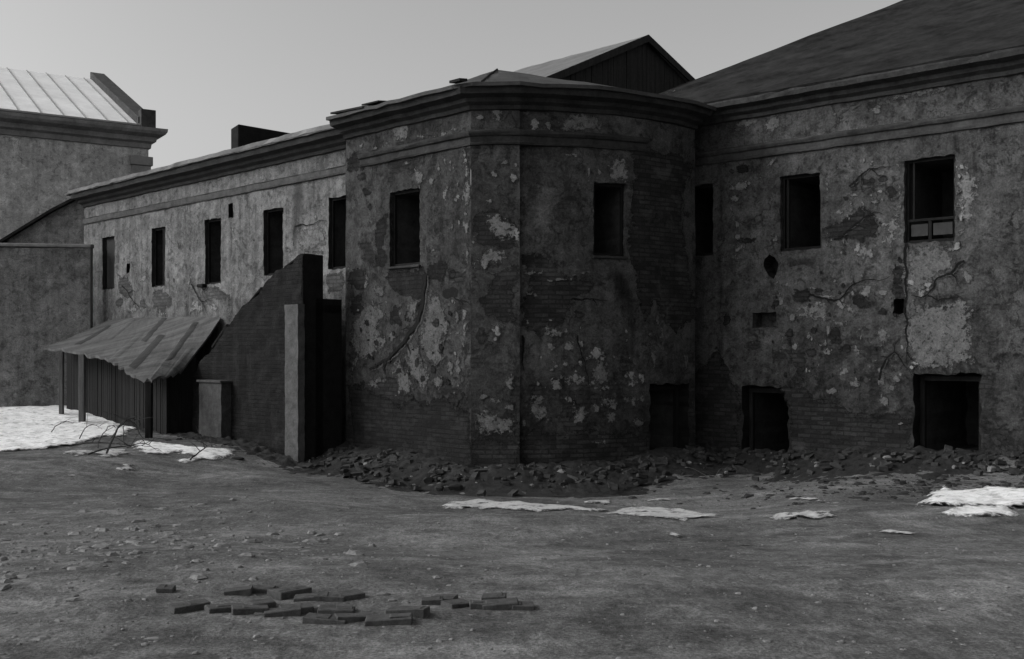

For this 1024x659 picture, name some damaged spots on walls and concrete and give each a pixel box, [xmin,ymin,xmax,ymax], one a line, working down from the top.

crack [369,273,428,374]
spalling [326,147,649,465]
spalling [587,144,695,333]
flaking render [729,156,776,259]
crack [834,166,886,243]
flaking render [764,157,979,407]
crack [810,243,967,381]